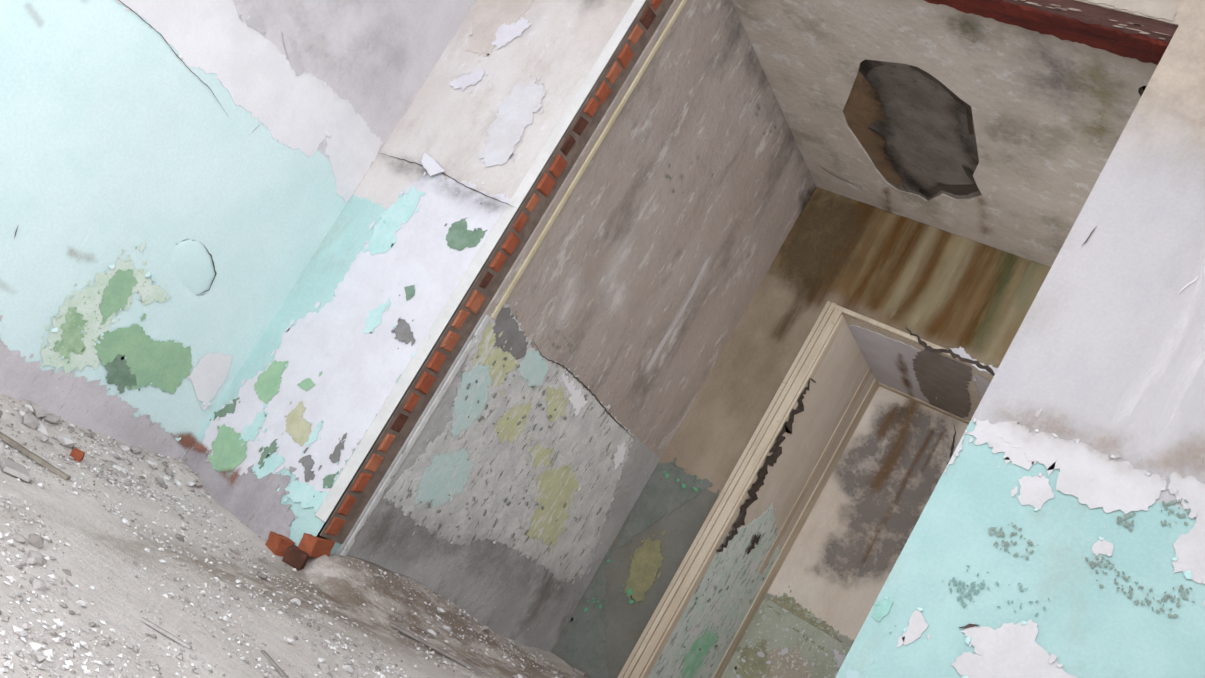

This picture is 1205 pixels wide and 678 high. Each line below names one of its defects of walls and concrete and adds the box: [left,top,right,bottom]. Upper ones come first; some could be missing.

spalling [843,59,982,200]
peeling [0,0,674,590]
crack [905,327,995,376]
peeling [623,530,666,604]
peeling [647,503,873,678]
crack [716,378,816,554]
water stain [825,407,950,578]
peeling [872,596,931,647]
peeling [942,565,1077,678]
peeling [848,324,1205,619]